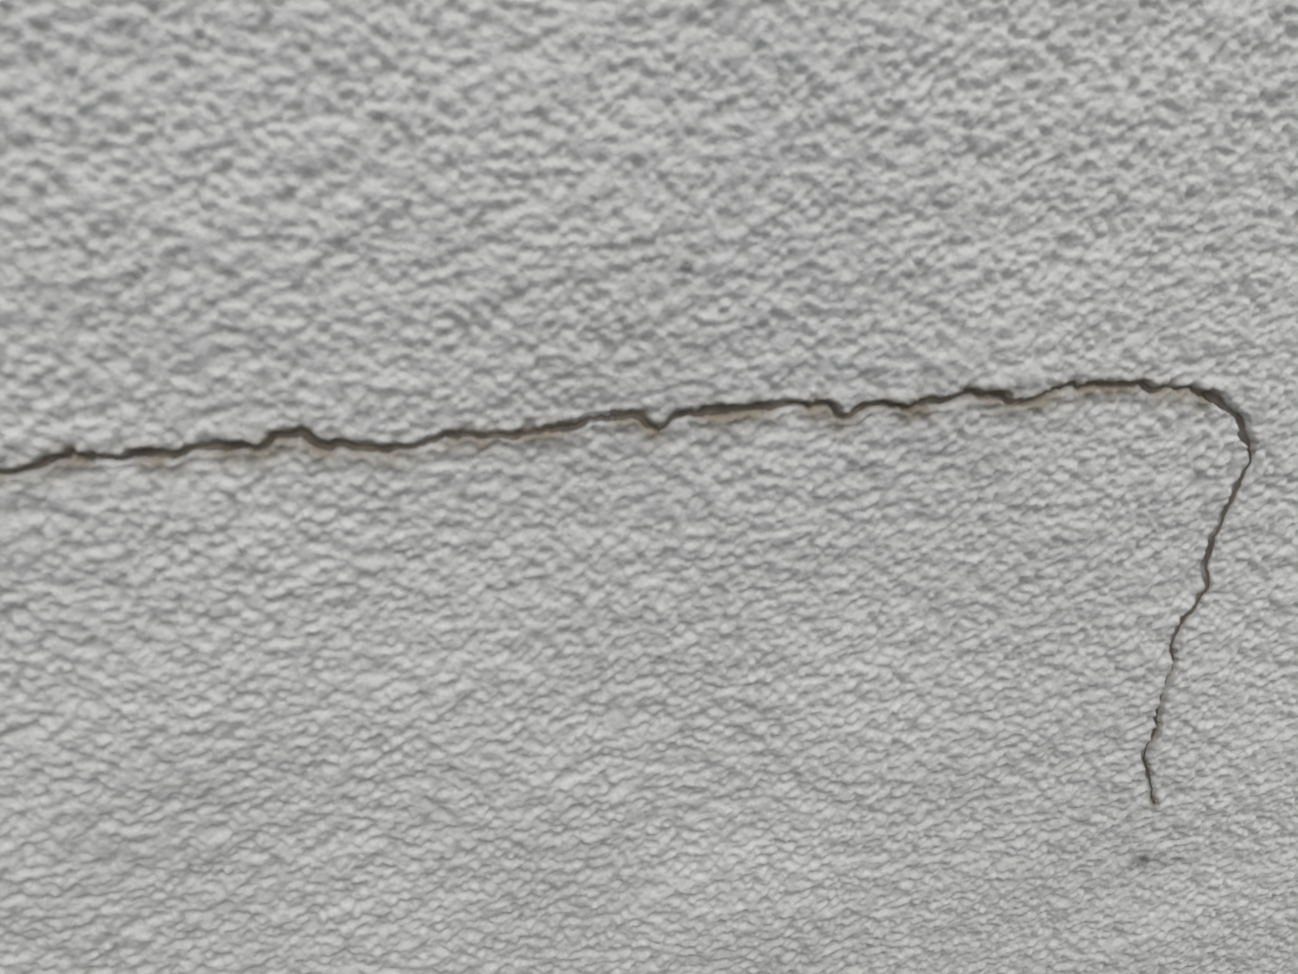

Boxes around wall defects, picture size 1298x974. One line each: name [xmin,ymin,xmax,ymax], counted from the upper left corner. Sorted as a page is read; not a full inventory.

crack [0,379,1252,805]